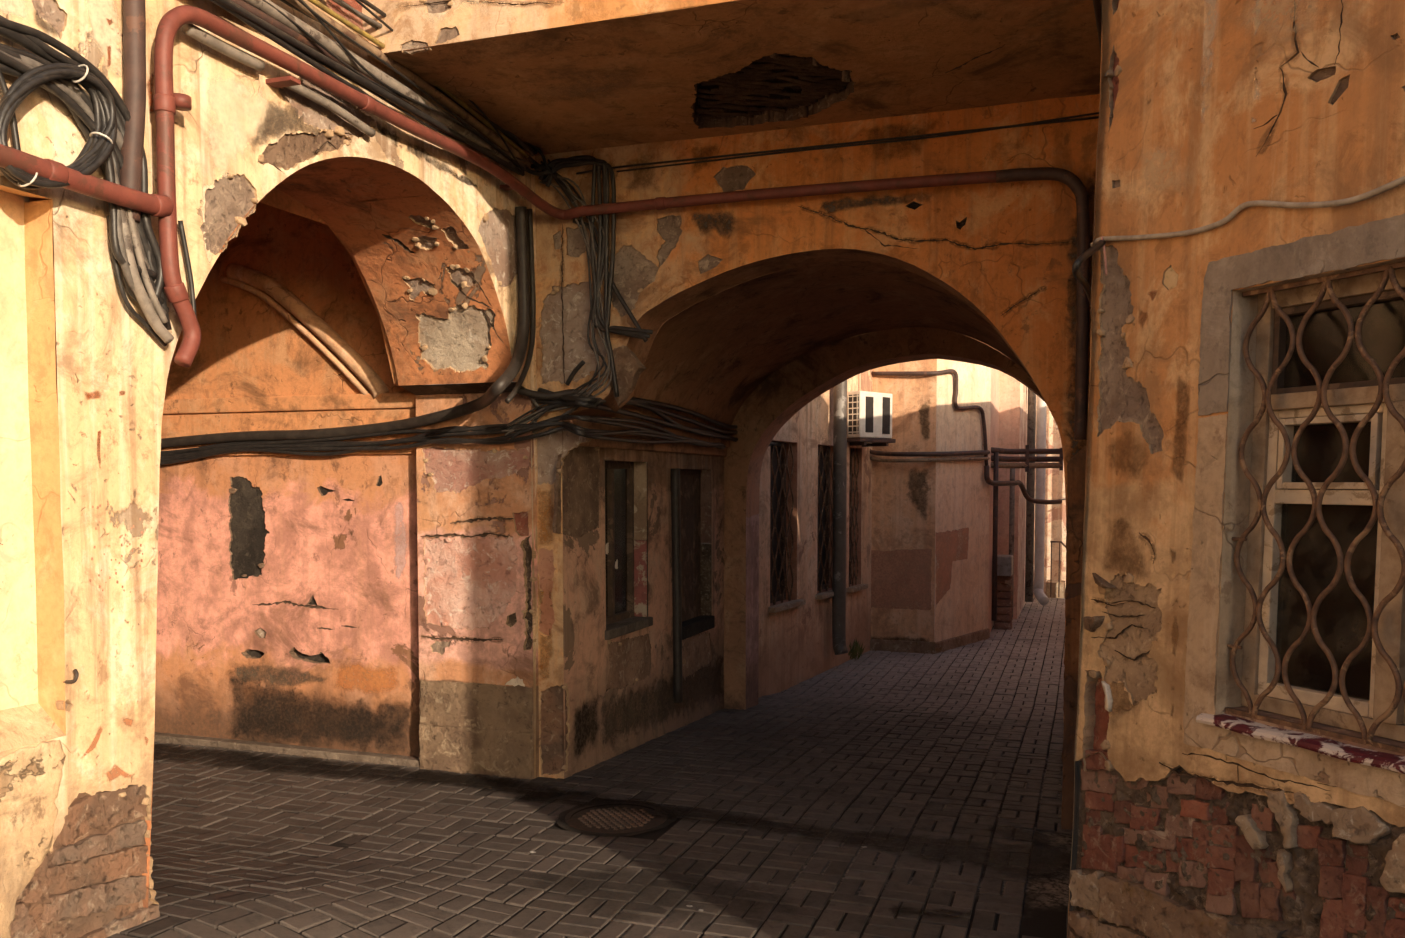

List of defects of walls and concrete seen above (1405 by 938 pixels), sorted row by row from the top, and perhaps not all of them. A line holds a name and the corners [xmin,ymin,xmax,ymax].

crack [1254,0,1343,156]
spalling [200,77,377,262]
spalling [402,207,518,373]
crack [799,206,1073,250]
spalling [1096,245,1164,454]
spalling [228,476,270,580]
crack [421,517,513,538]
crack [253,600,357,630]
leakage [230,666,409,749]
crack [421,634,502,642]
flaking render [1068,573,1405,938]
spalling [0,783,160,938]